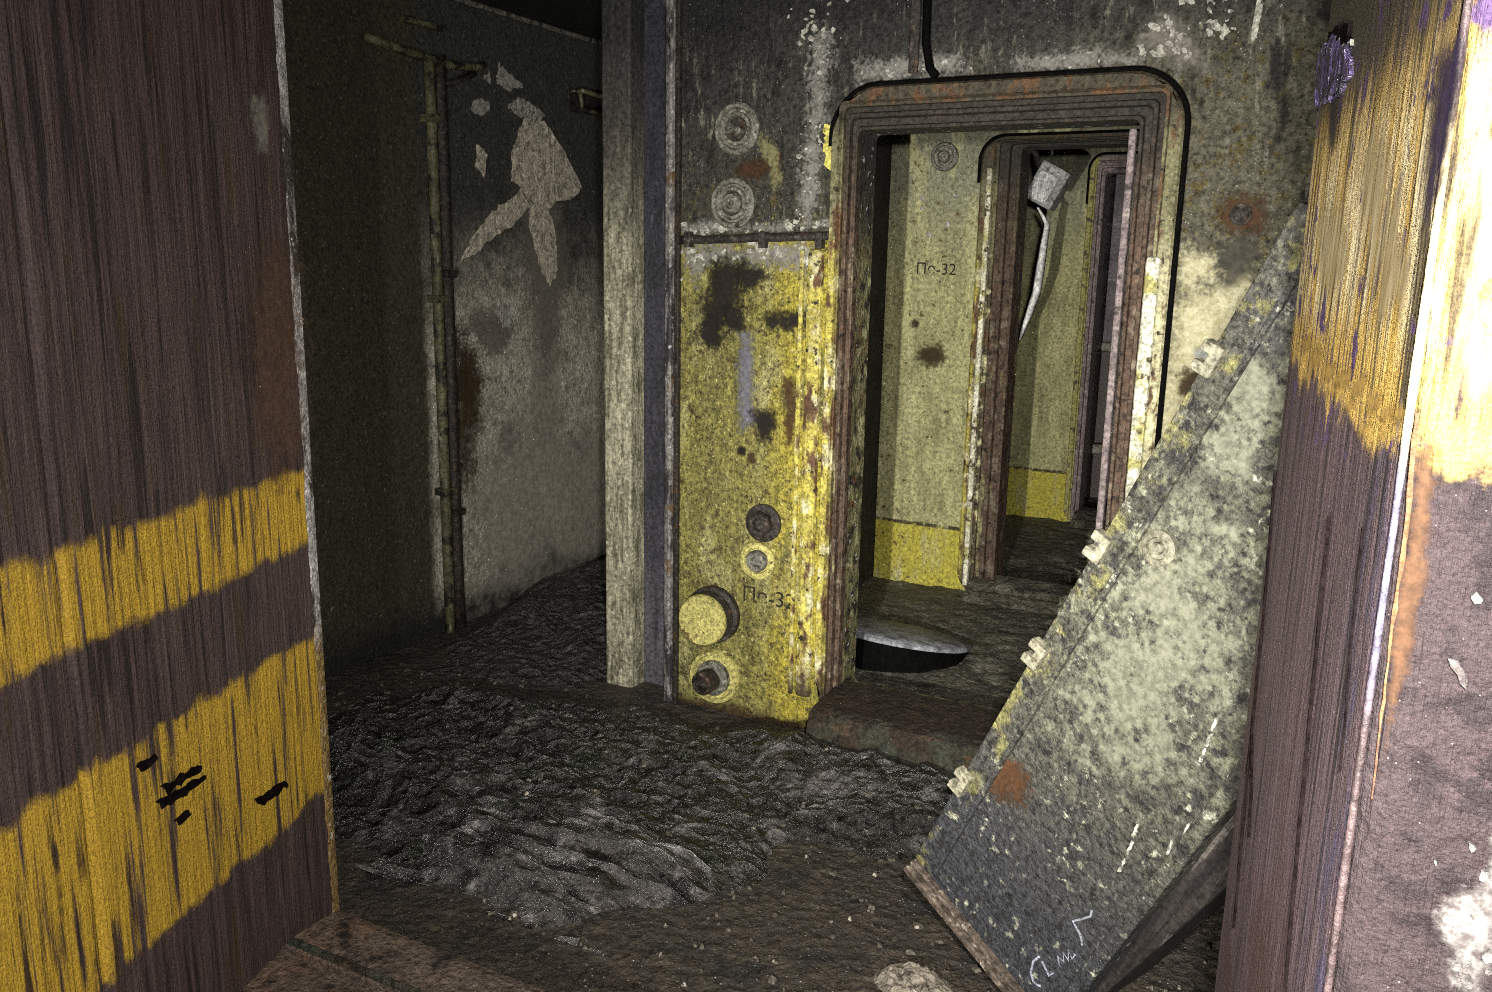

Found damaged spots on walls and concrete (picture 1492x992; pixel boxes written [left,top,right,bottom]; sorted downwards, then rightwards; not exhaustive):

peeling [1010,0,1263,73]
peeling [681,0,972,286]
corrosion [917,343,947,368]
corrosion [1371,412,1432,799]
spalling [1471,591,1483,604]
spalling [1448,658,1468,689]
spalling [1434,859,1492,992]